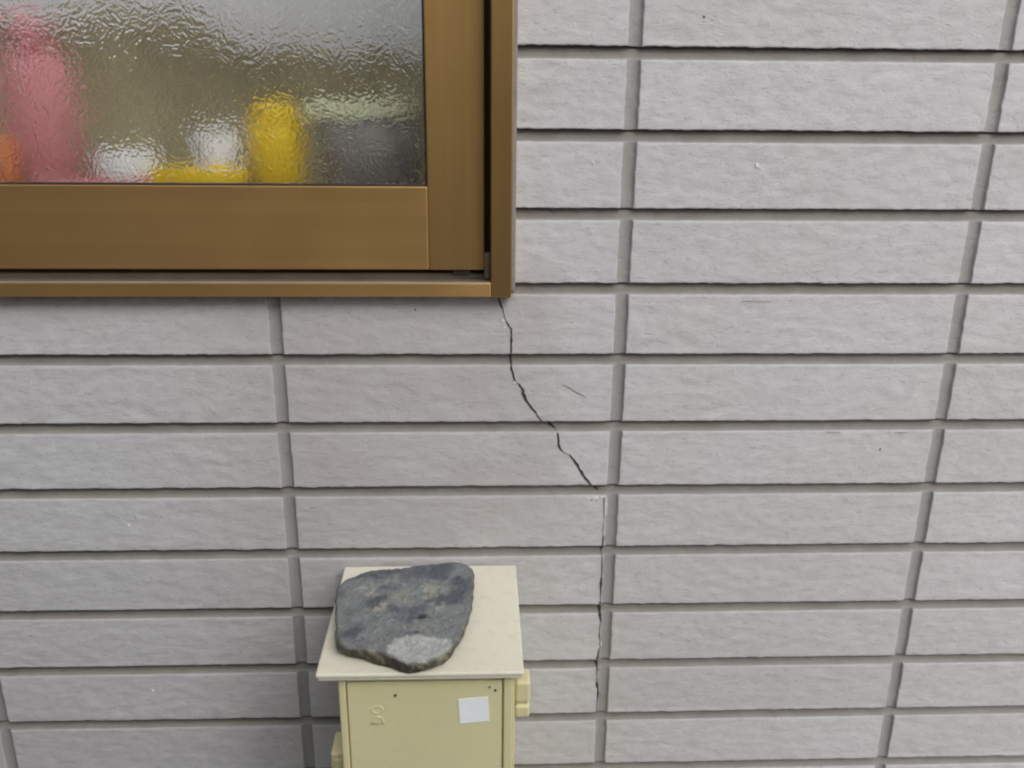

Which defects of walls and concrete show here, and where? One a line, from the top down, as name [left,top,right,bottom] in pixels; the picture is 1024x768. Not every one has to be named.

crack [498,298,607,709]